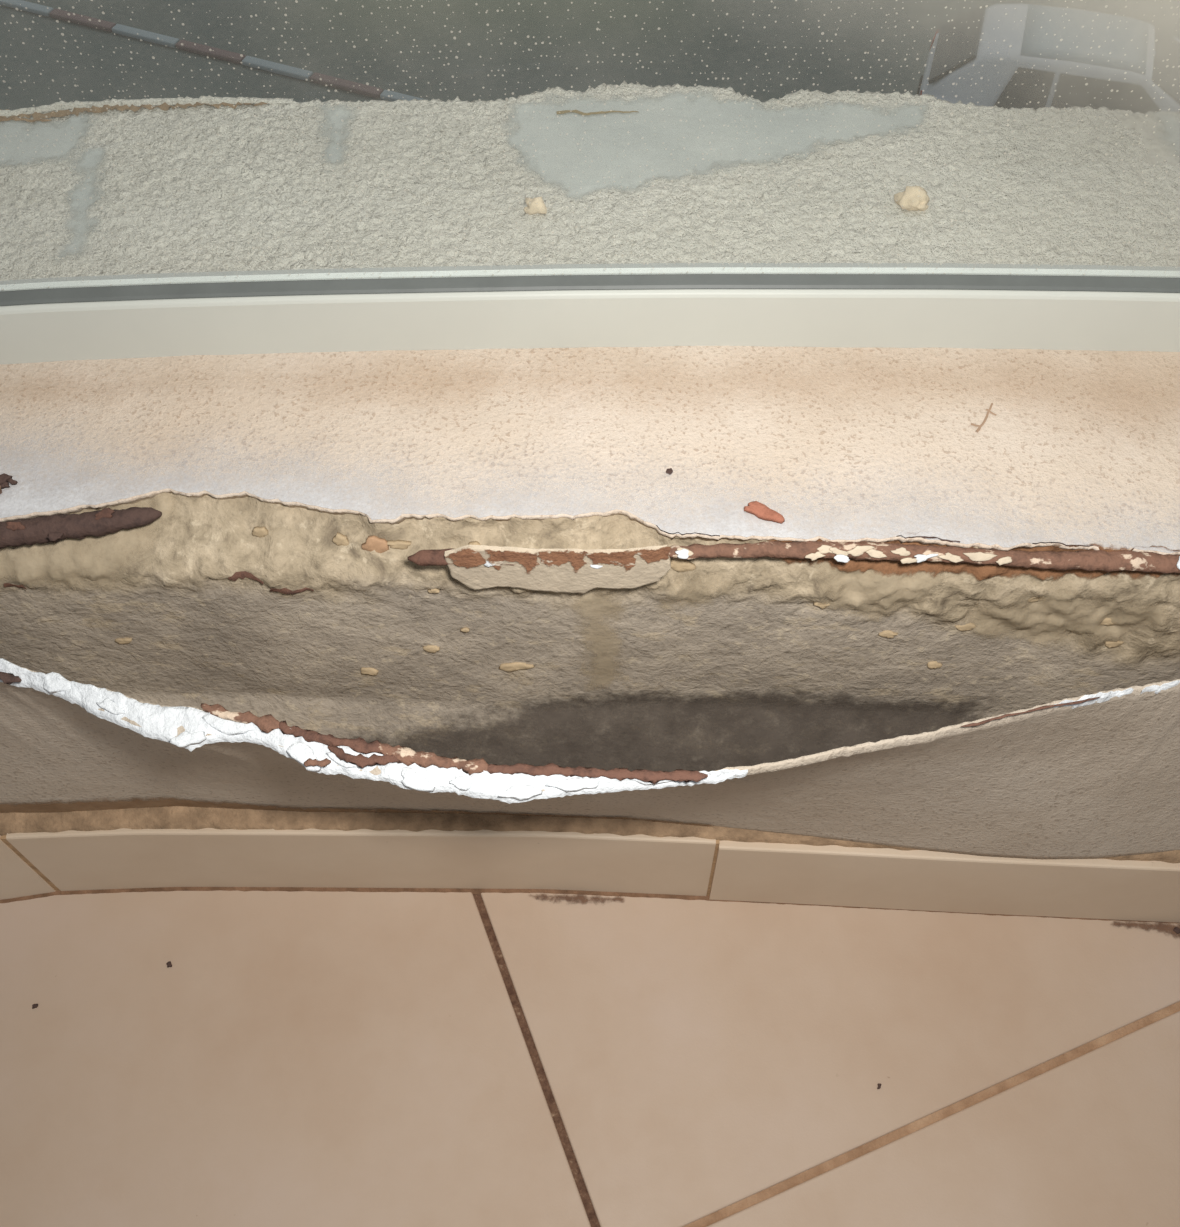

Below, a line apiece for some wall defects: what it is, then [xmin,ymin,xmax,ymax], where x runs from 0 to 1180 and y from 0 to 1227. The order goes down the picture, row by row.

flaking render [508,92,926,199]
rust [446,525,720,573]
rust [782,535,1180,581]
rust [0,672,22,685]
rust [201,703,708,784]
spalling [0,493,1180,804]
damp [354,692,980,772]
rust [961,697,1100,727]